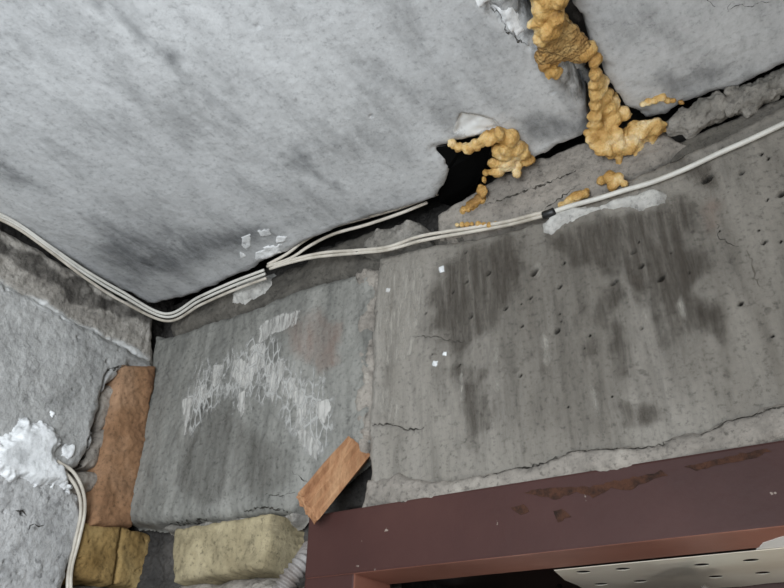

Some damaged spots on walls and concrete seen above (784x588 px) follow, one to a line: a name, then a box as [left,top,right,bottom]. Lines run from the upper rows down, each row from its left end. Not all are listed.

crack [491,8,529,46]
crack [489,171,576,207]
damp [436,244,518,348]
damp [626,203,703,316]
damp [182,311,333,460]